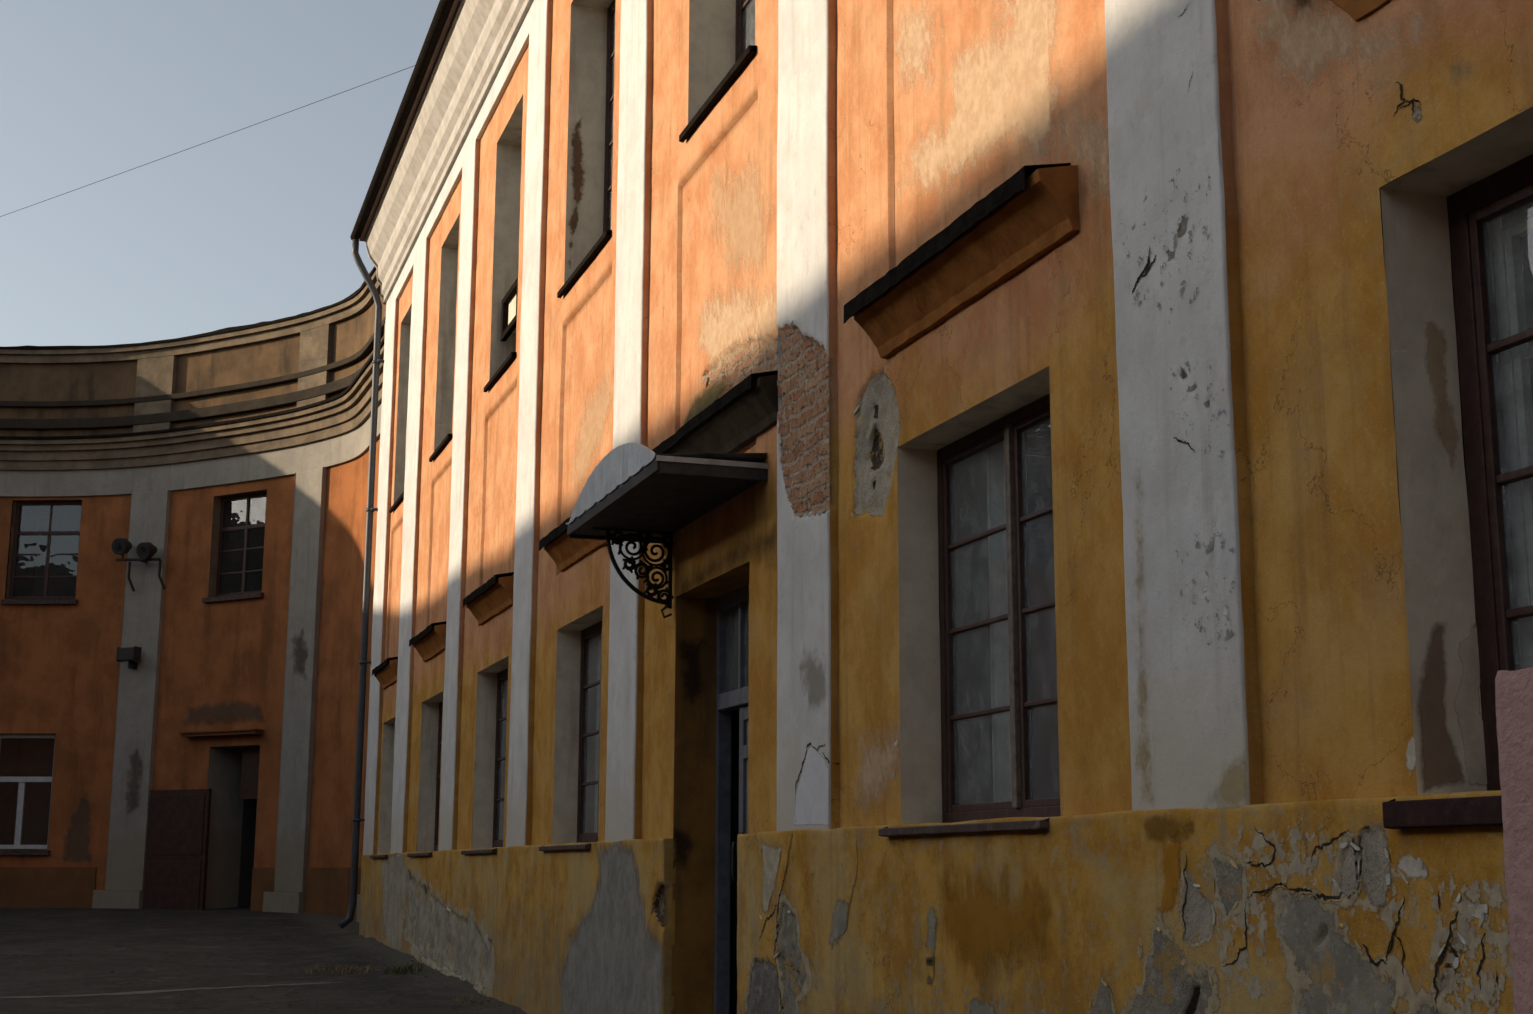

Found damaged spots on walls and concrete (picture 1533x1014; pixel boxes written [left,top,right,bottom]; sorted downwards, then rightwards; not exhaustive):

peeling [1121,169,1213,311]
flaking render [699,288,830,518]
flaking render [851,368,901,518]
peeling [1170,361,1229,458]
water stain [1419,625,1464,792]
peeling [793,746,829,825]
flaking render [381,853,495,998]
flaking render [651,883,665,927]
flaking render [744,841,811,1014]
crack [1222,826,1365,967]
flaking render [1086,816,1514,1014]